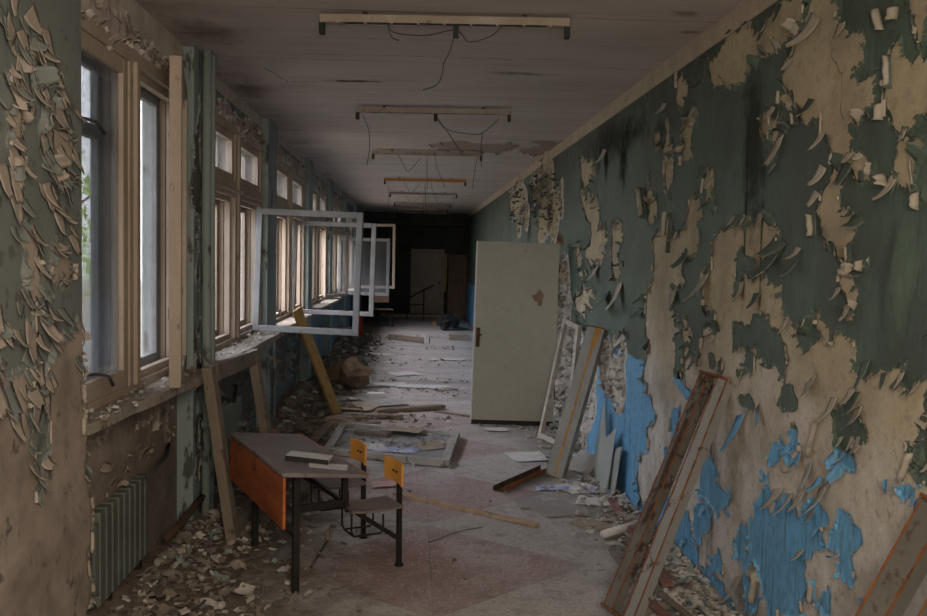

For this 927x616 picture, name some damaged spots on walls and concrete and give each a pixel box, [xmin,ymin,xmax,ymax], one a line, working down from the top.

peeling [0,0,177,616]
peeling [424,140,564,244]
peeling [553,149,625,424]
peeling [576,0,927,616]